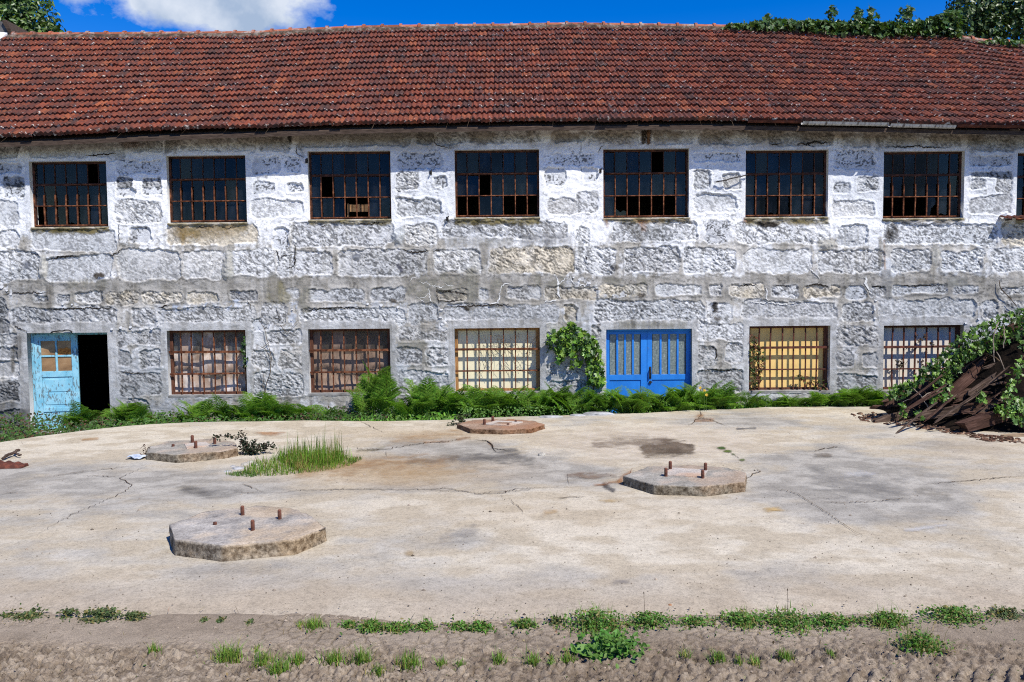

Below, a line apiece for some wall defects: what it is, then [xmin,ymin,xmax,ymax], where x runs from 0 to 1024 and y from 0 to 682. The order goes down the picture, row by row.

damp [600,438,693,457]